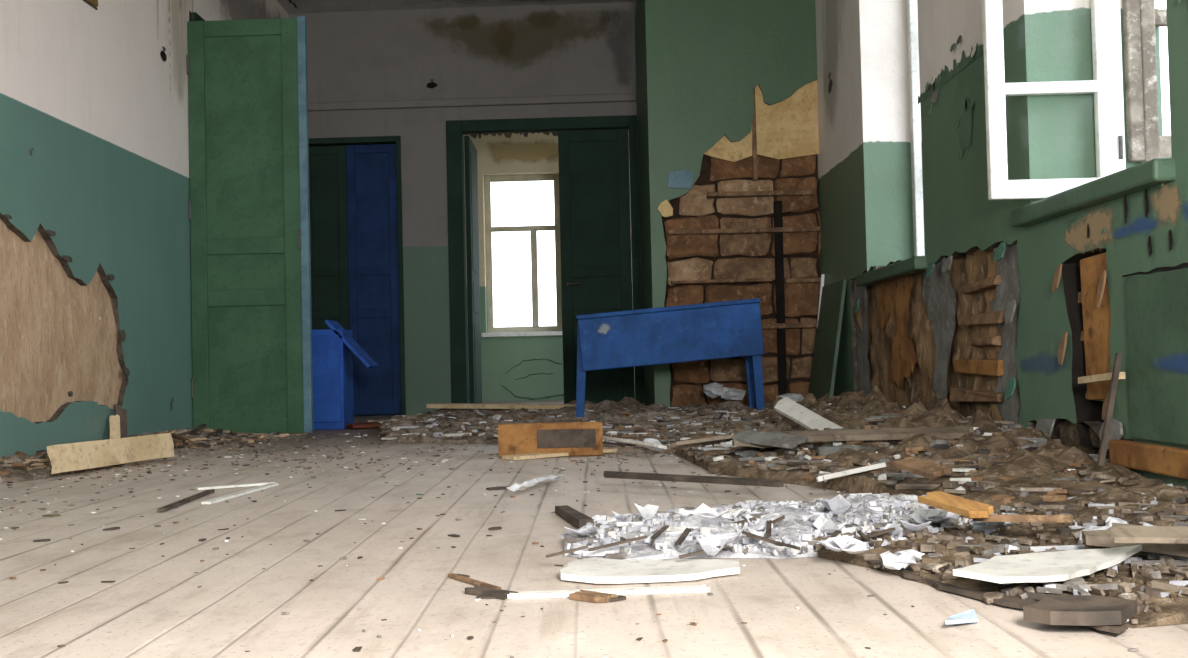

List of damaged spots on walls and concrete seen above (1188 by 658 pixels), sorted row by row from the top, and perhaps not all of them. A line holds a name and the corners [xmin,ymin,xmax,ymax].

spalling [0,214,130,423]
spalling [658,72,831,407]
spalling [854,242,1021,428]
spalling [1035,195,1134,459]
peeling [1145,183,1181,251]